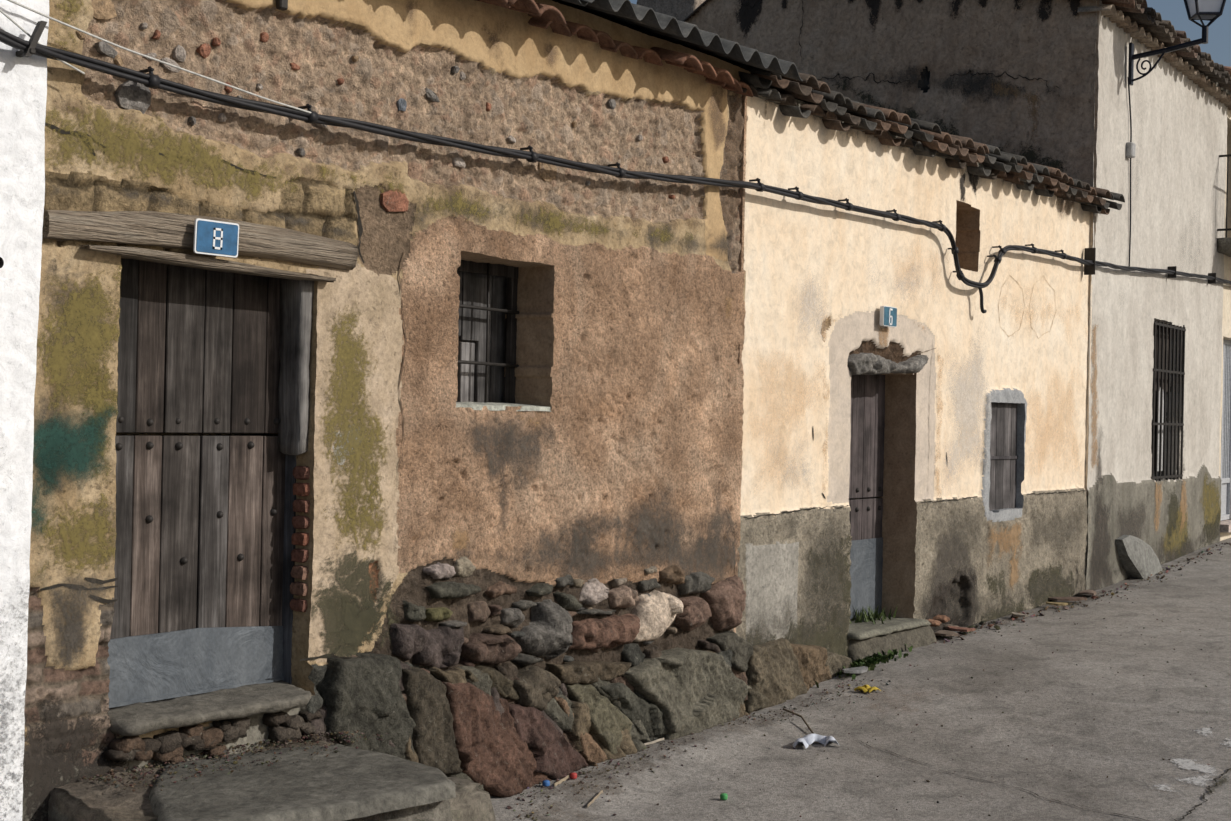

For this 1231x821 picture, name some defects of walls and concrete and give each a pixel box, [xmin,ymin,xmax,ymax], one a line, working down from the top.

leakage [736,0,763,36]
leakage [848,0,923,29]
leakage [1014,0,1052,22]
flaking render [42,0,748,276]
flaking render [848,327,941,375]
leakage [474,418,552,485]
leakage [500,495,736,580]
leakage [922,443,1146,633]
leakage [311,546,400,659]
flaking render [389,557,746,673]
flaking render [0,587,120,766]
crack [861,741,1231,821]